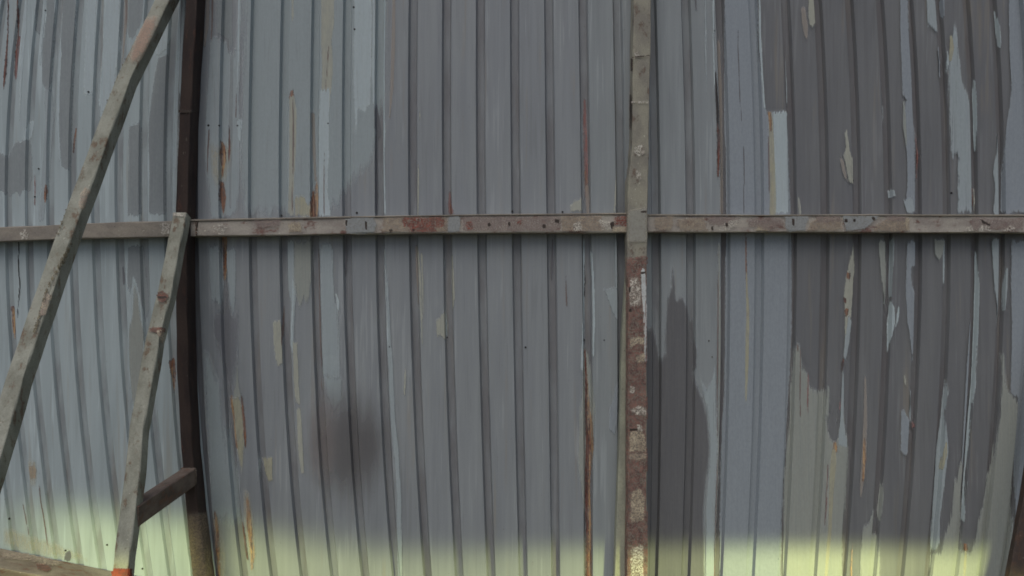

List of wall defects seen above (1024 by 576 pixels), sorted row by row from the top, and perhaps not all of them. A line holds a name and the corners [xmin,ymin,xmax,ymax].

peeling [927,0,945,31]
rust [207,101,237,212]
peeling [888,0,915,213]
rust [382,192,453,234]
peeling [879,238,915,361]
peeling [930,0,1024,576]
rust [230,395,246,465]
rust [578,240,595,576]
peeling [900,376,915,454]
peeling [860,483,884,576]